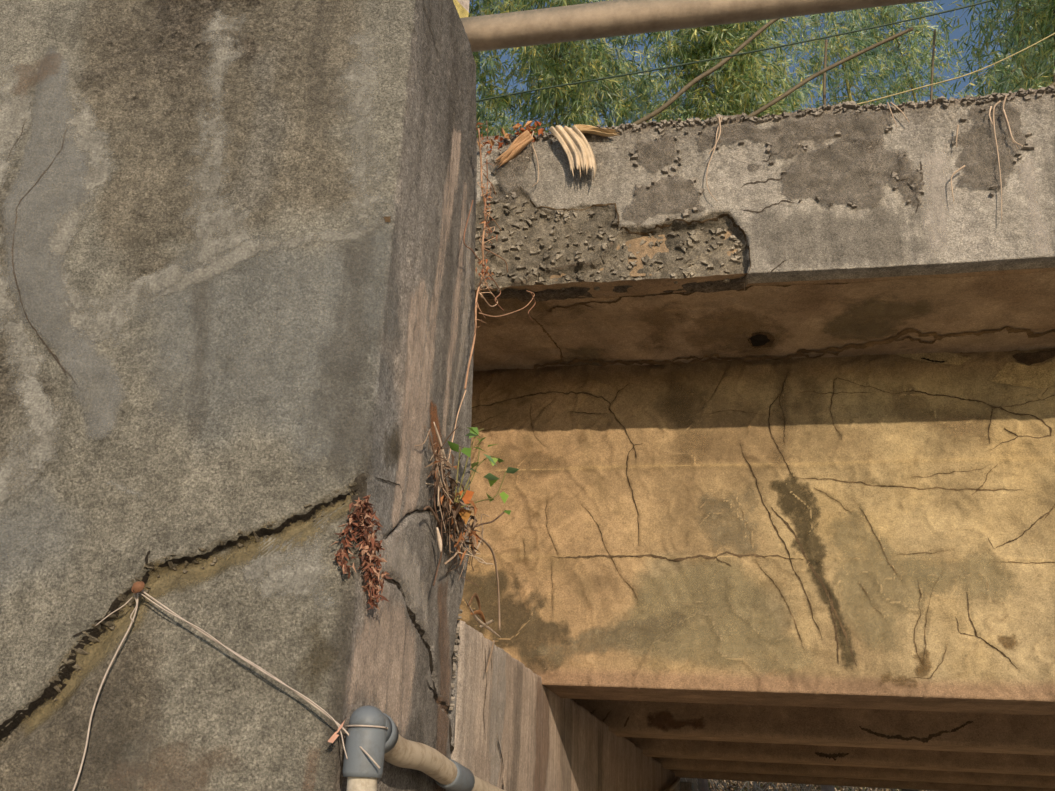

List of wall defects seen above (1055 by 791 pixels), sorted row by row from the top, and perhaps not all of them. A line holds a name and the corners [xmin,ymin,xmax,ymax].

crack [12,125,81,391]
spalling [475,109,925,292]
crack [737,260,848,291]
crack [0,477,442,747]
crack [384,577,454,752]
crack [483,650,504,790]
crack [471,292,1055,681]
water stain [772,473,856,668]